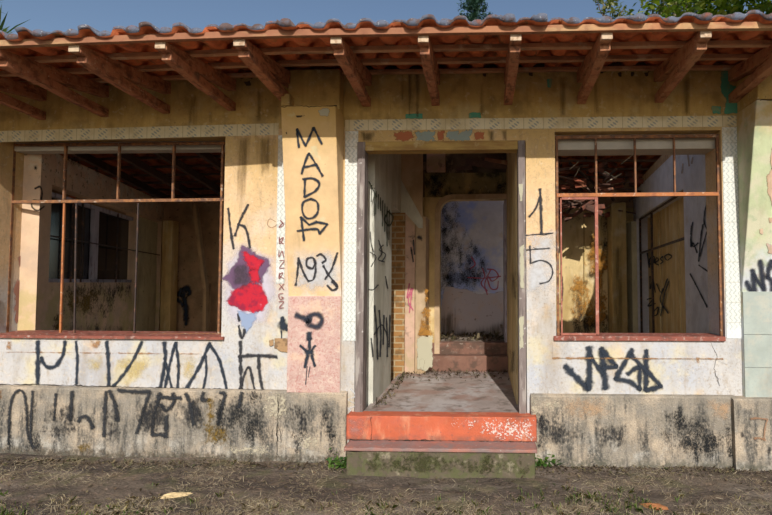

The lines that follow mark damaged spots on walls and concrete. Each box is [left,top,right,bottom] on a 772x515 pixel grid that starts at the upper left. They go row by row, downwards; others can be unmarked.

leakage [26,407,75,451]
leakage [136,403,168,434]
leakage [182,391,263,441]
leakage [284,405,309,453]
leakage [538,414,583,447]
leakage [597,426,626,446]
leakage [665,407,733,459]